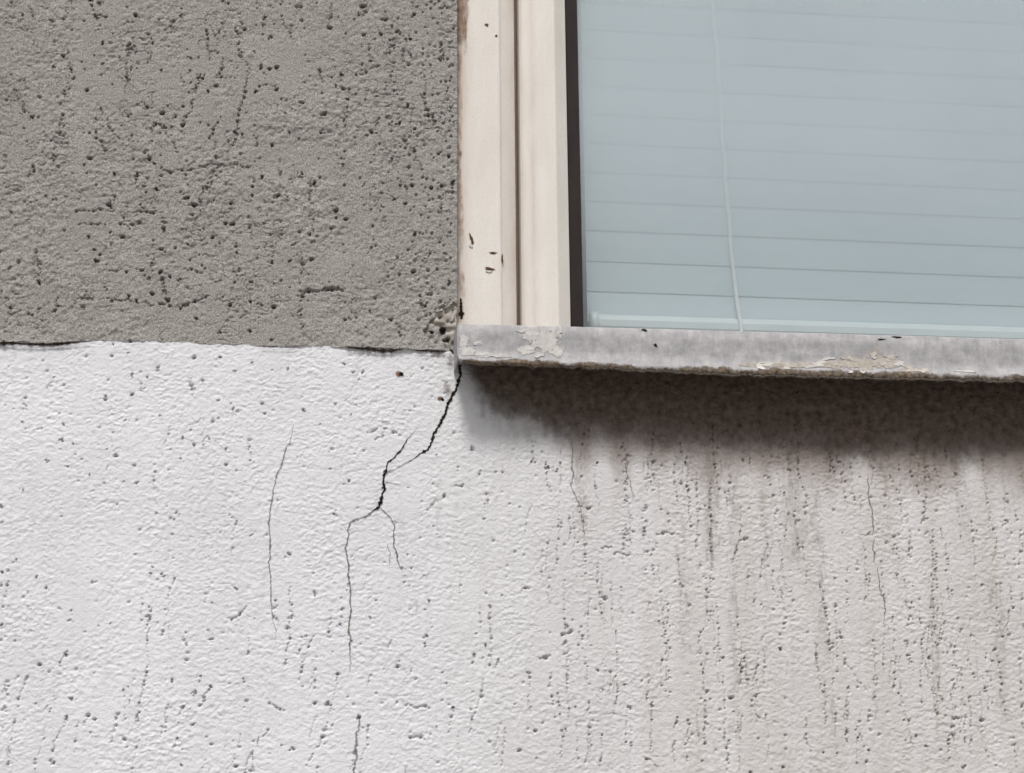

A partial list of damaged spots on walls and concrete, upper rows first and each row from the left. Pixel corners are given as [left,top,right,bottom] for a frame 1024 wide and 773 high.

peeling [428,301,564,358]
peeling [739,336,930,373]
leakage [468,364,1024,468]
crack [344,347,462,672]